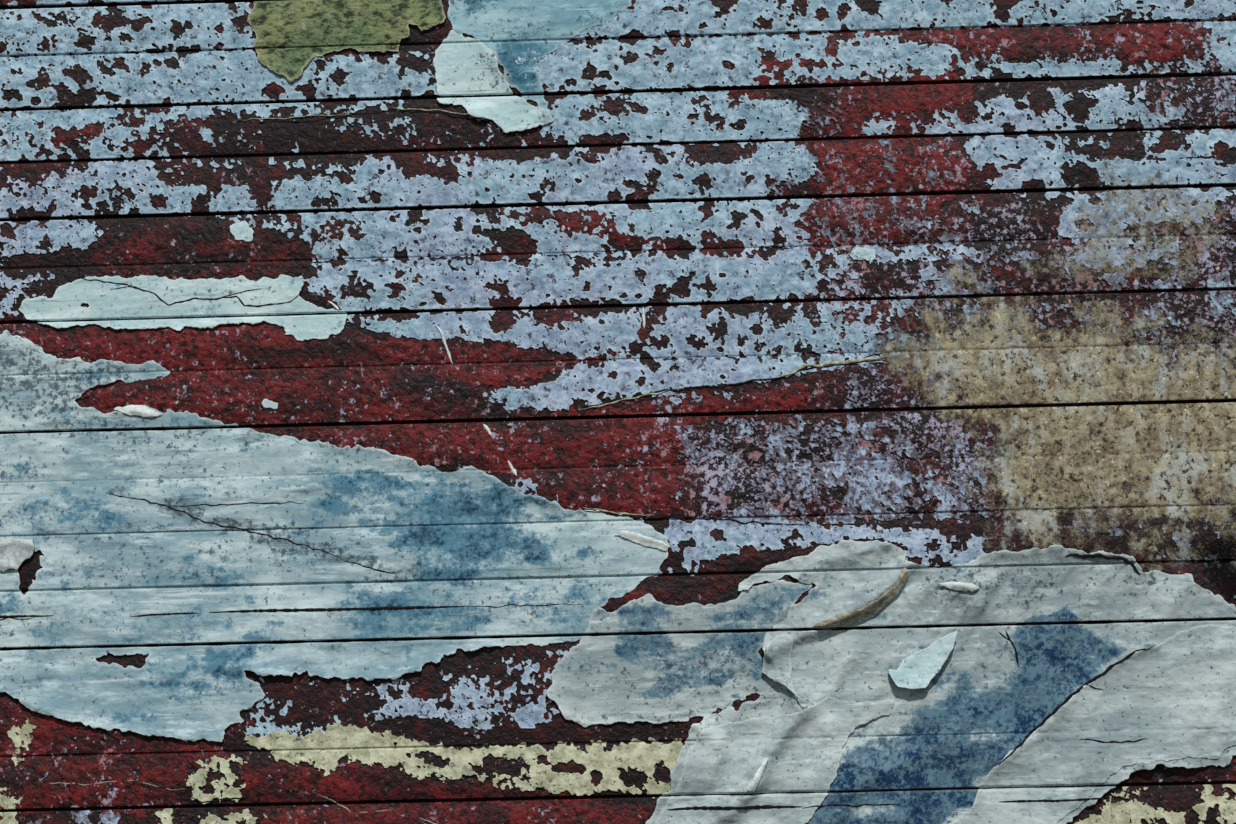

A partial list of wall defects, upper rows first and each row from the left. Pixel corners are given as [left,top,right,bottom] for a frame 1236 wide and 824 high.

peeling [0,0,1236,577]
crack [108,493,396,574]
crack [132,603,582,617]
peeling [239,650,683,799]
peeling [70,806,121,824]
peeling [185,754,267,824]
peeling [1074,780,1236,824]